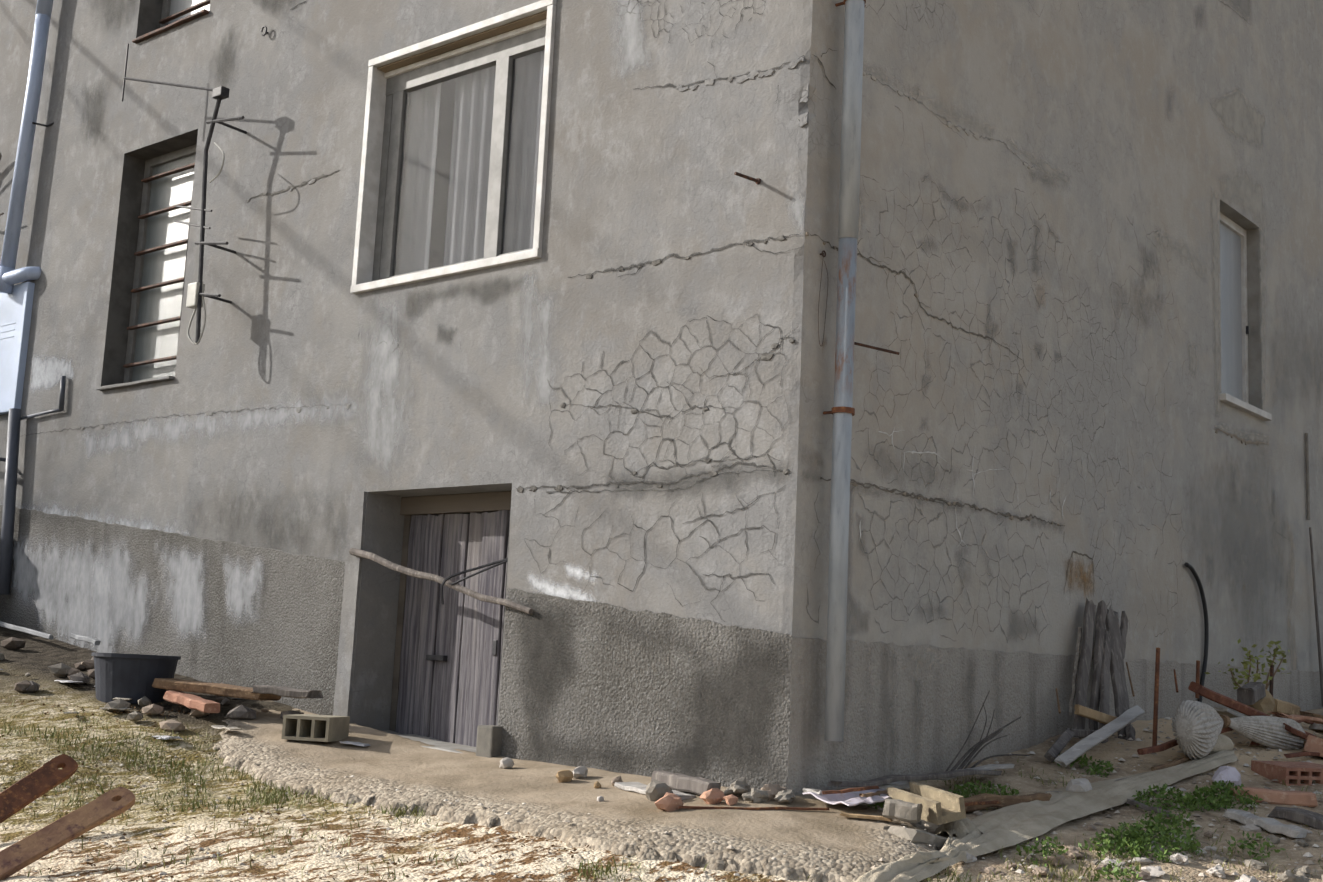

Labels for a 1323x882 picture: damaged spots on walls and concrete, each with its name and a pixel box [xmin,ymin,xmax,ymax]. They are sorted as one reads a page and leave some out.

crack [516,0,1190,644]